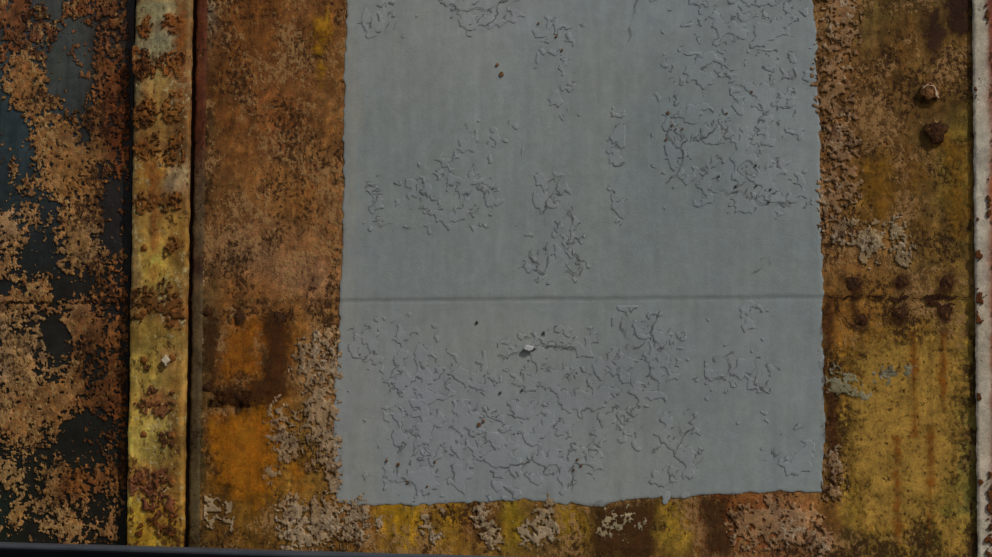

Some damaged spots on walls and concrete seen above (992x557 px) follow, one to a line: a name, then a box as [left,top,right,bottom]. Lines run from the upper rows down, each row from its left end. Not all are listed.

peeling [0,0,130,545]
corrosion [131,267,185,330]
corrosion [132,3,187,258]
crack [365,125,497,232]
crack [516,173,589,284]
crack [651,0,811,218]
corrosion [133,385,177,419]
corrosion [202,306,294,412]
peeling [262,324,384,551]
crack [348,308,780,502]
peeling [516,494,560,550]
peeling [595,504,647,543]